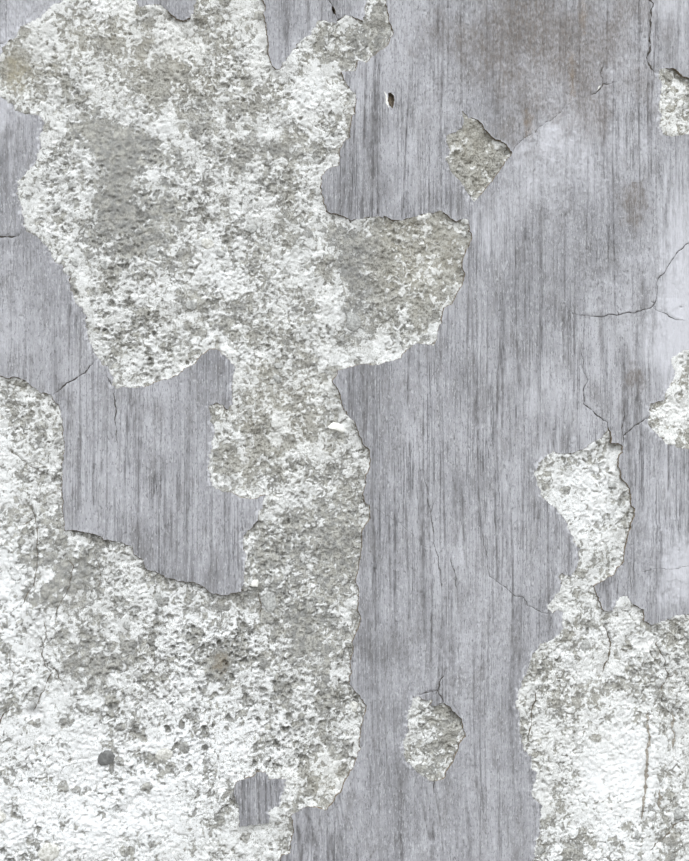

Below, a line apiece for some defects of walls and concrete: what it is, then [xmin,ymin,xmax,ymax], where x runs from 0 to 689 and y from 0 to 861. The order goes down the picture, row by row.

crack [646,0,656,73]
spalling [658,68,689,137]
spalling [446,111,512,202]
crack [569,243,688,320]
spalling [0,0,472,861]
crack [581,346,644,443]
spalling [648,350,689,449]
crack [33,558,74,711]
spalling [515,427,689,861]